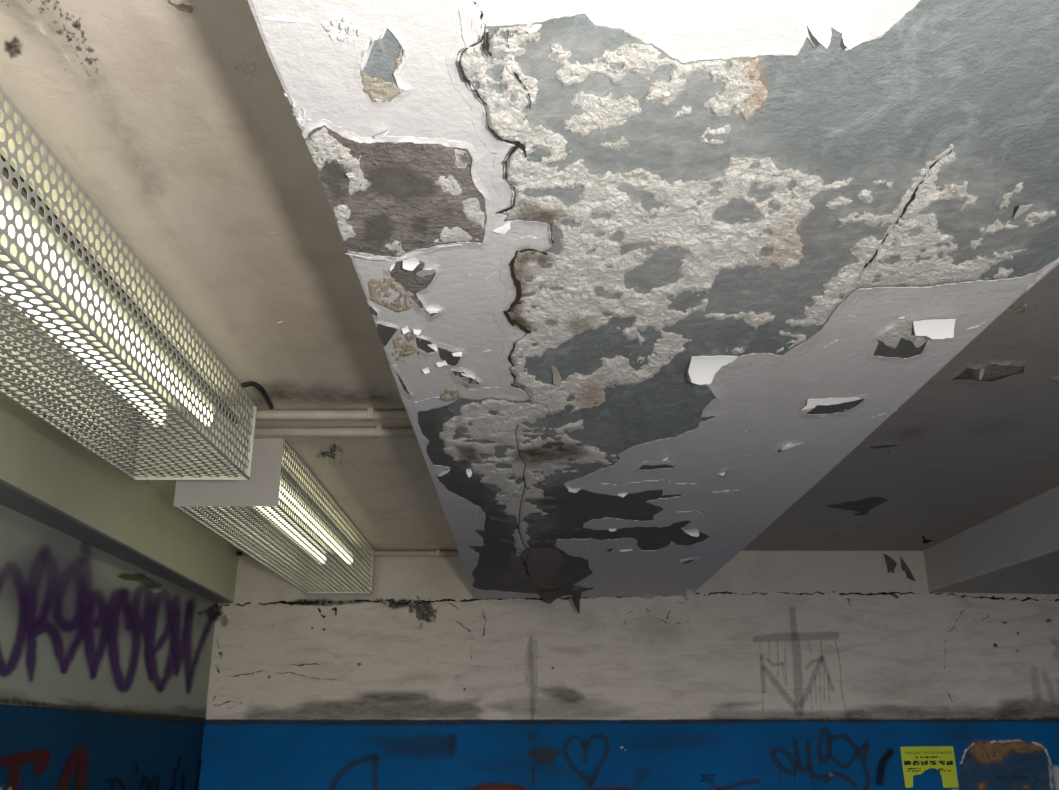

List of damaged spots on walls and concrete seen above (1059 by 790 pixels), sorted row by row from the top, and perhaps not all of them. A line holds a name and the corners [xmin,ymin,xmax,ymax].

water stain [5,38,20,57]
crack [458,1,531,214]
crack [863,150,952,269]
crack [504,222,554,402]
peeling [284,0,1059,613]
water stain [199,604,222,622]
water stain [377,597,436,622]
crack [222,426,1059,702]